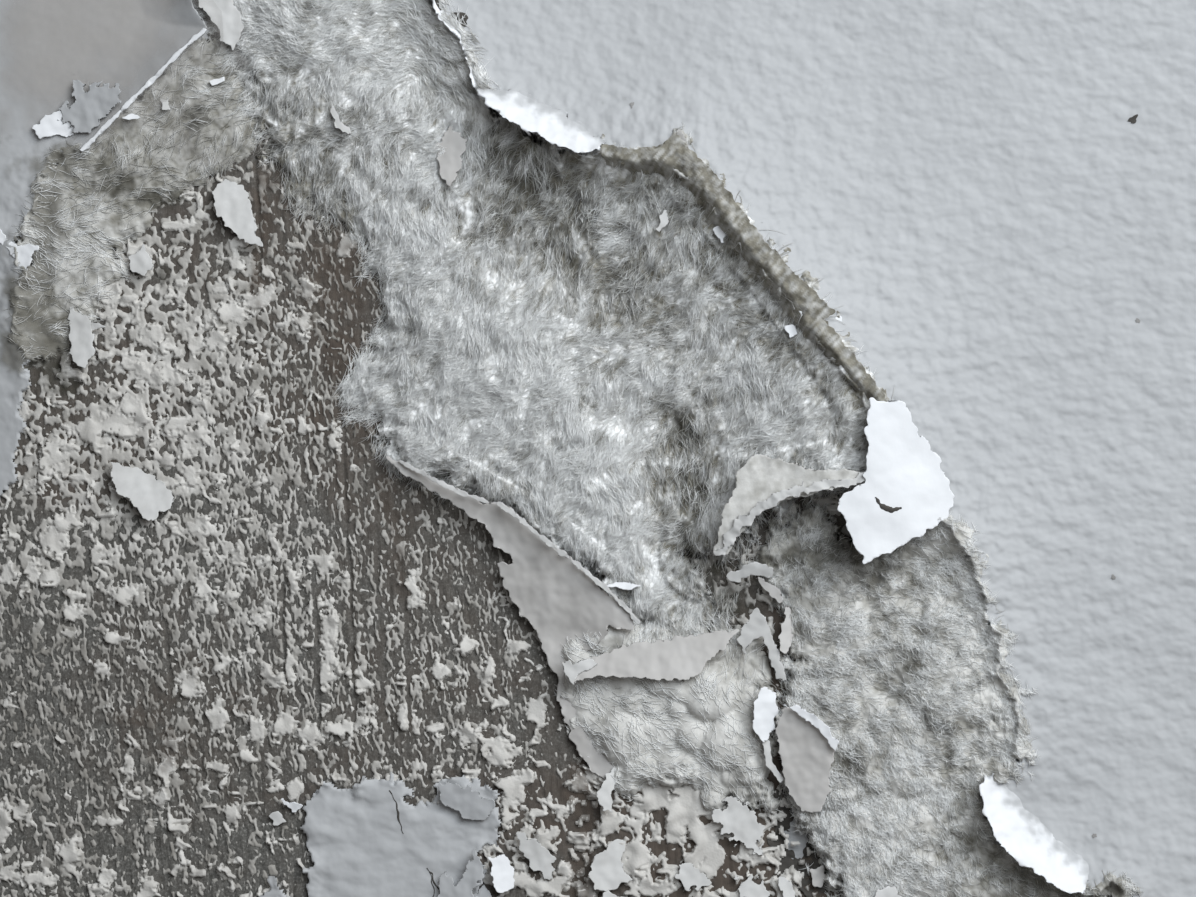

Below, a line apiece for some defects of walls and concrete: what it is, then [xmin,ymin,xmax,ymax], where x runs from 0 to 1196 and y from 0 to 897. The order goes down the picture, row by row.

peeling [203,17,220,42]
peeling [432,0,606,153]
peeling [0,97,858,897]
crack [389,790,404,834]
crack [427,868,440,897]
peeling [979,773,1089,894]